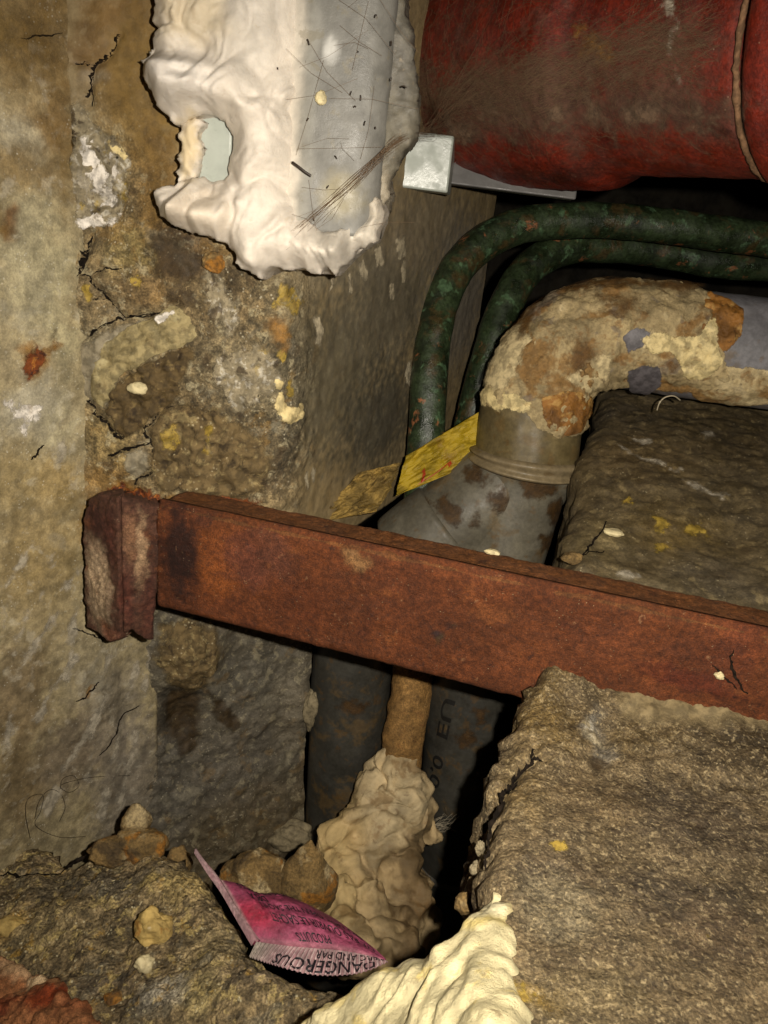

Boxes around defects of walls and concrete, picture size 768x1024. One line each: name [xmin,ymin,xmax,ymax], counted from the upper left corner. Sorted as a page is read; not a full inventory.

crack [75,34,120,106]
crack [77,236,177,337]
spalling [203,270,240,338]
rust [22,344,59,380]
spalling [81,305,305,499]
crack [712,650,748,694]
crack [483,748,546,870]